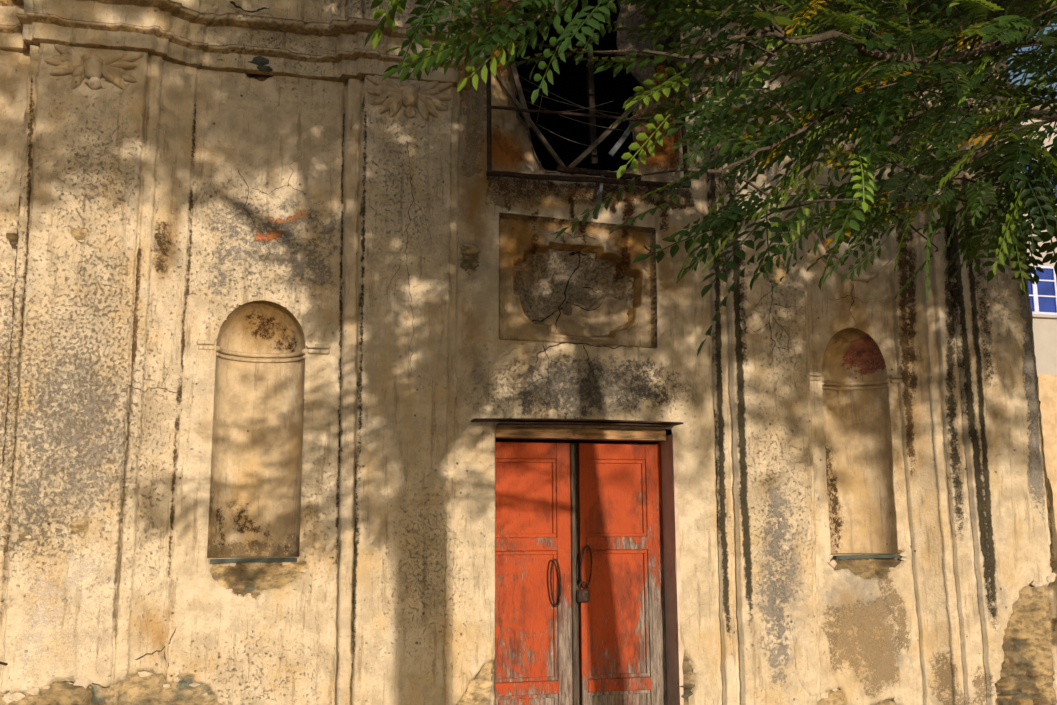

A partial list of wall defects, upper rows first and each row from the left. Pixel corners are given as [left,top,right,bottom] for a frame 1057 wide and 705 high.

peeling [459,0,695,208]
rust [636,64,681,170]
crack [523,220,672,409]
water stain [520,356,686,419]
water stain [707,144,753,633]
water stain [896,195,918,475]
water stain [942,172,998,623]
spalling [0,670,219,705]
spalling [456,661,493,705]
peeling [817,550,911,705]
spalling [930,422,1057,705]